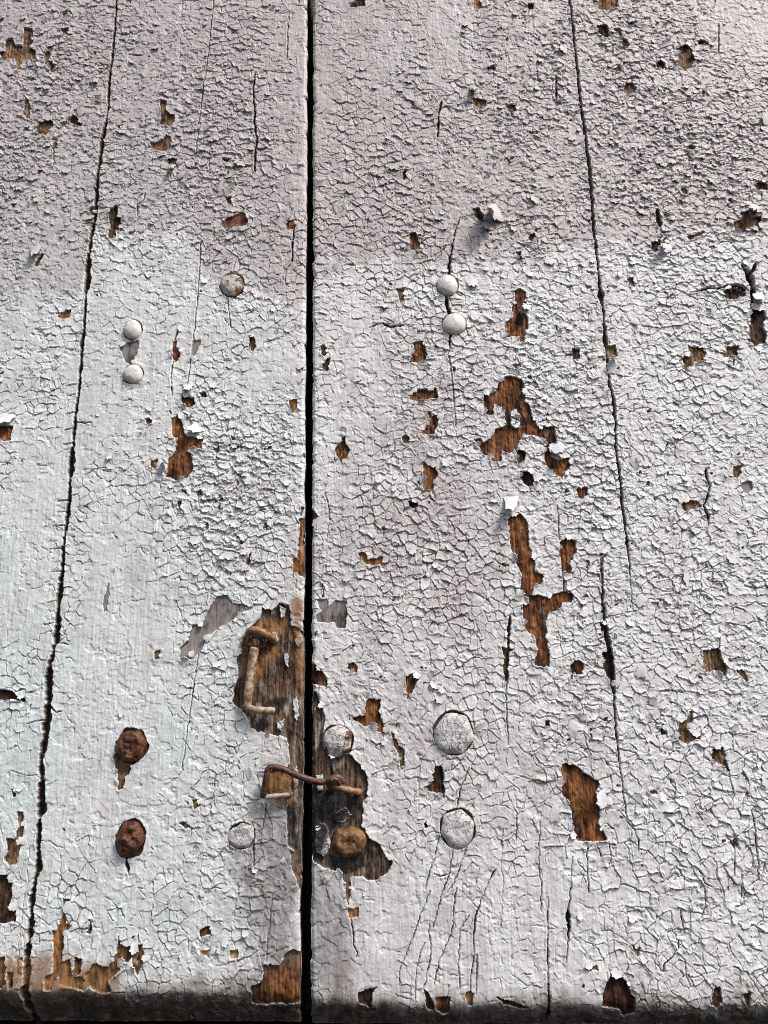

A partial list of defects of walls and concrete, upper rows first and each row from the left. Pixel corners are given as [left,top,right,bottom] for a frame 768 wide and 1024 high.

crack [445,218,460,427]
crack [555,0,632,647]
peeling [474,364,573,487]
crack [23,0,120,1024]
rust [241,599,303,692]
peeling [504,496,576,667]
peeling [0,812,27,927]
rust [268,773,296,808]
peeling [180,595,393,918]
crack [399,836,496,991]
crack [516,815,611,1014]
peeling [558,761,608,845]